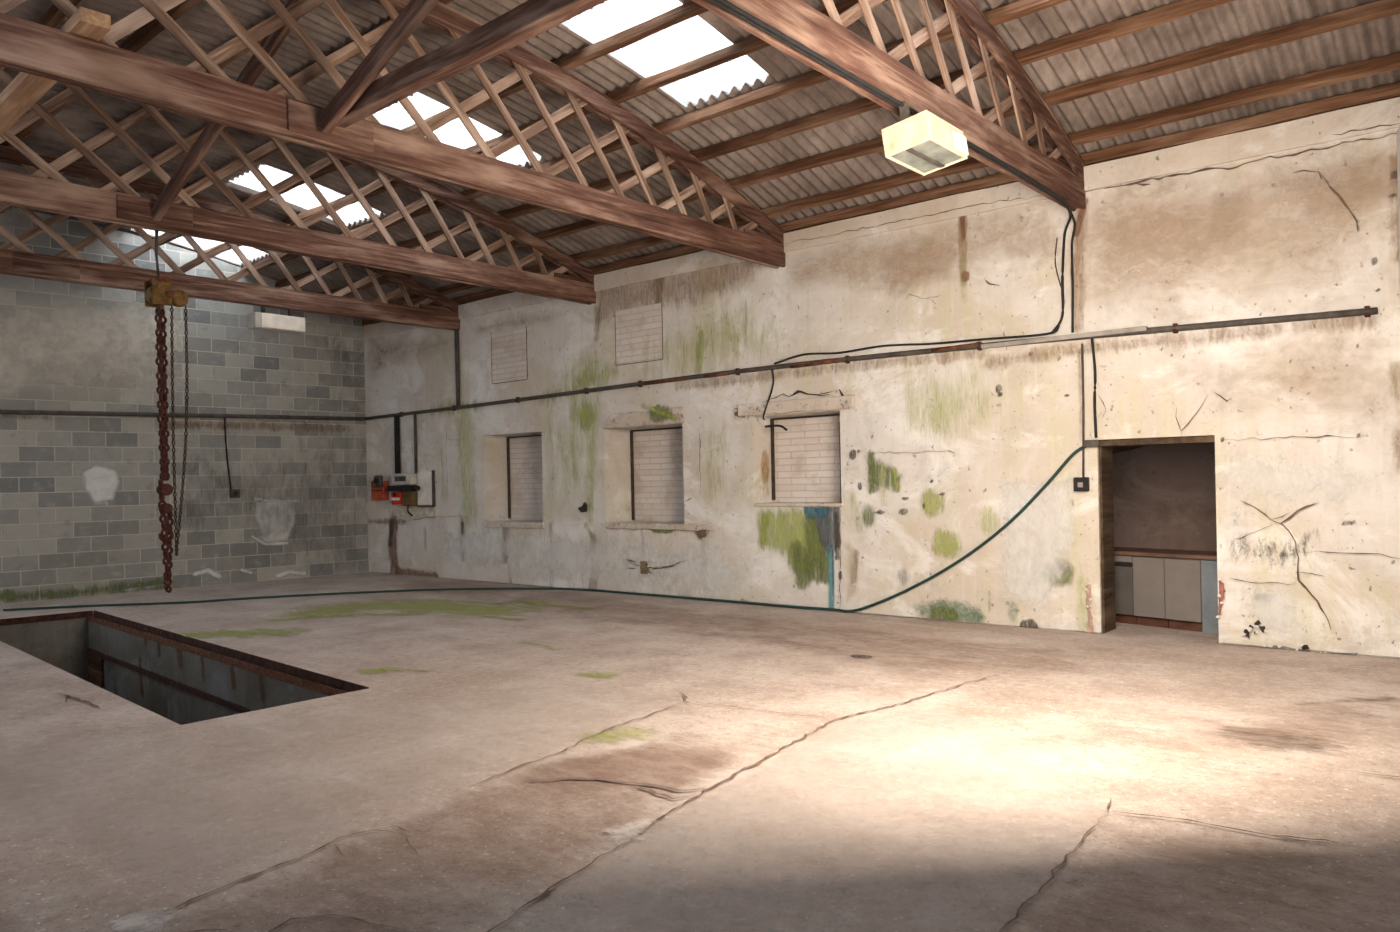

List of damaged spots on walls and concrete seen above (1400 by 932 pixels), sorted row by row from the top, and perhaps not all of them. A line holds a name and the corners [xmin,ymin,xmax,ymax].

crack [1085,123,1400,231]
leakage [849,449,875,493]
leakage [789,507,840,608]
leakage [931,607,982,621]
crack [1229,500,1400,630]
crack [470,670,1015,932]
crack [999,799,1338,932]